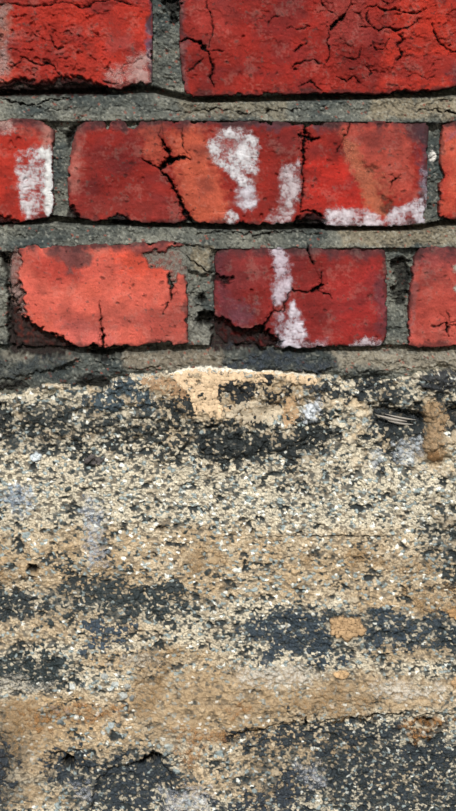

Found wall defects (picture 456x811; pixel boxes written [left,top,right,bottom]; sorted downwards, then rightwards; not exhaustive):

crack [180,6,223,85]
crack [268,2,452,89]
crack [147,107,331,333]
peeling [140,366,322,428]